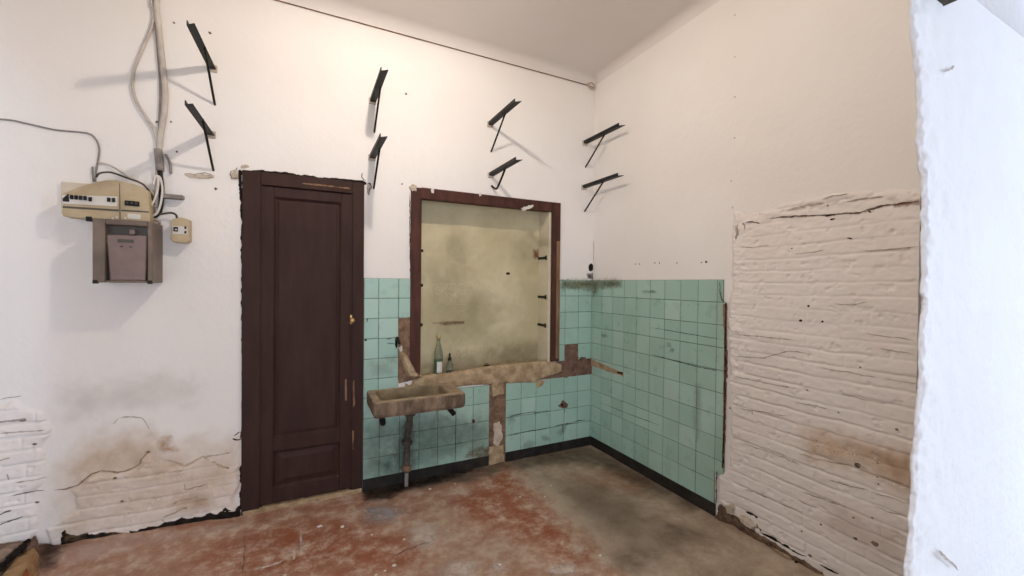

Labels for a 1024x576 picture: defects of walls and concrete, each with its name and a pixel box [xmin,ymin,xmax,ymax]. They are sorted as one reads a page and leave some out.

flaking render [230,164,372,392]
peeling [395,318,422,383]
spalling [536,344,592,388]
damp [562,281,619,292]
flaking render [715,188,920,576]
crack [732,194,919,251]
flaking render [0,399,241,545]
crack [0,396,241,572]